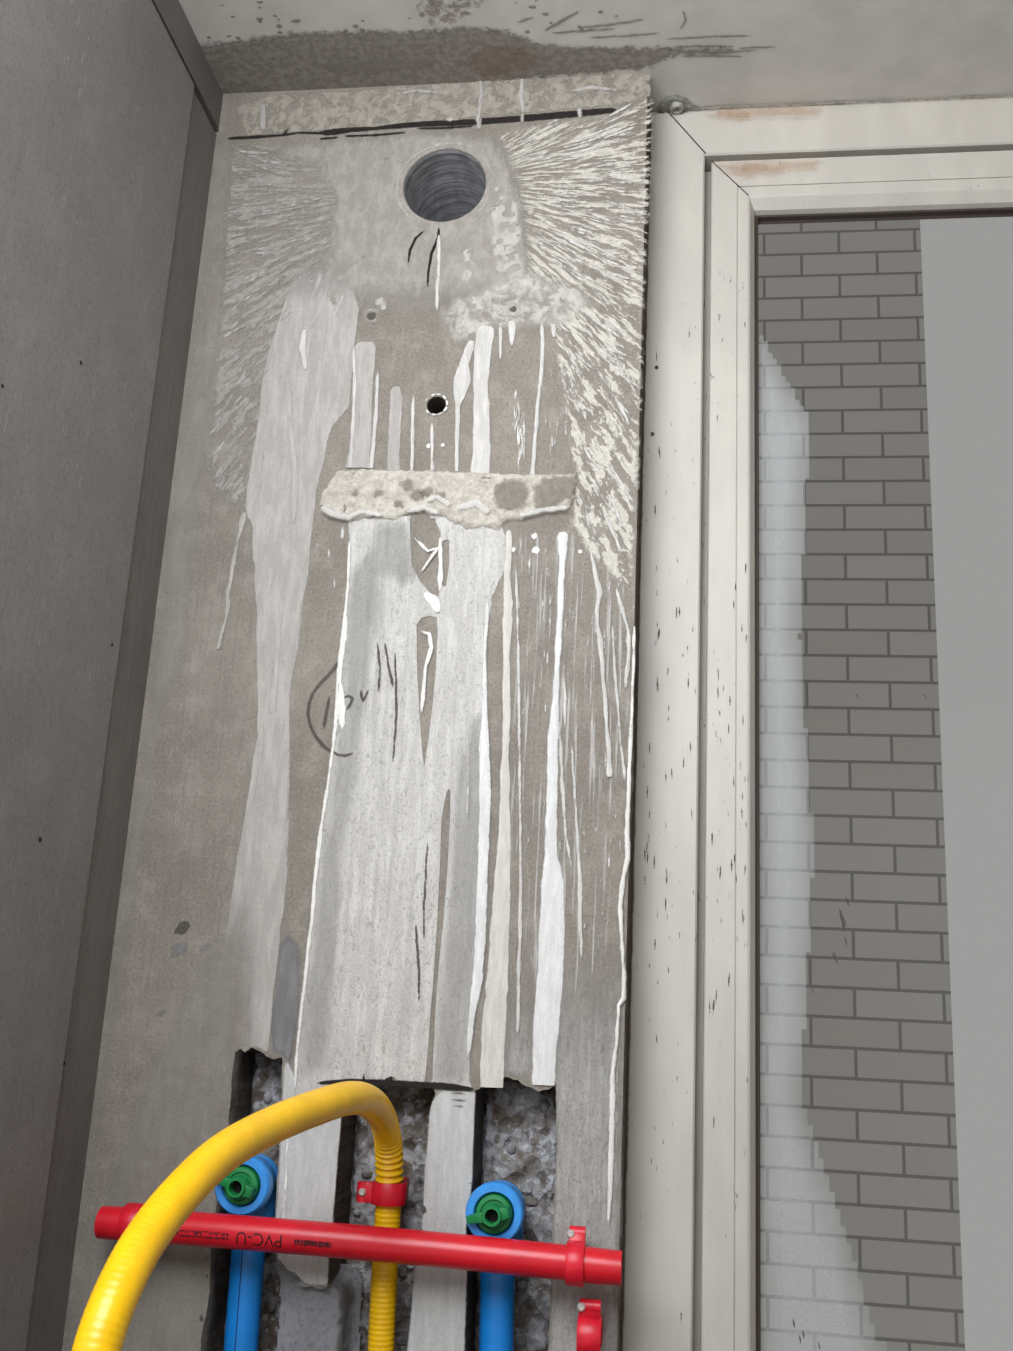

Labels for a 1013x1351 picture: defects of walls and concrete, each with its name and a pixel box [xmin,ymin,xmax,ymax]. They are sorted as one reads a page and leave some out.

crack [153,0,616,140]
water stain [201,0,773,129]
water stain [207,150,330,489]
crack [408,227,440,286]
water stain [535,103,641,451]
water stain [514,390,526,465]
spalling [375,479,445,507]
peeling [494,475,574,509]
water stain [577,446,633,554]
water stain [272,938,298,1060]
spalling [276,1257,363,1351]